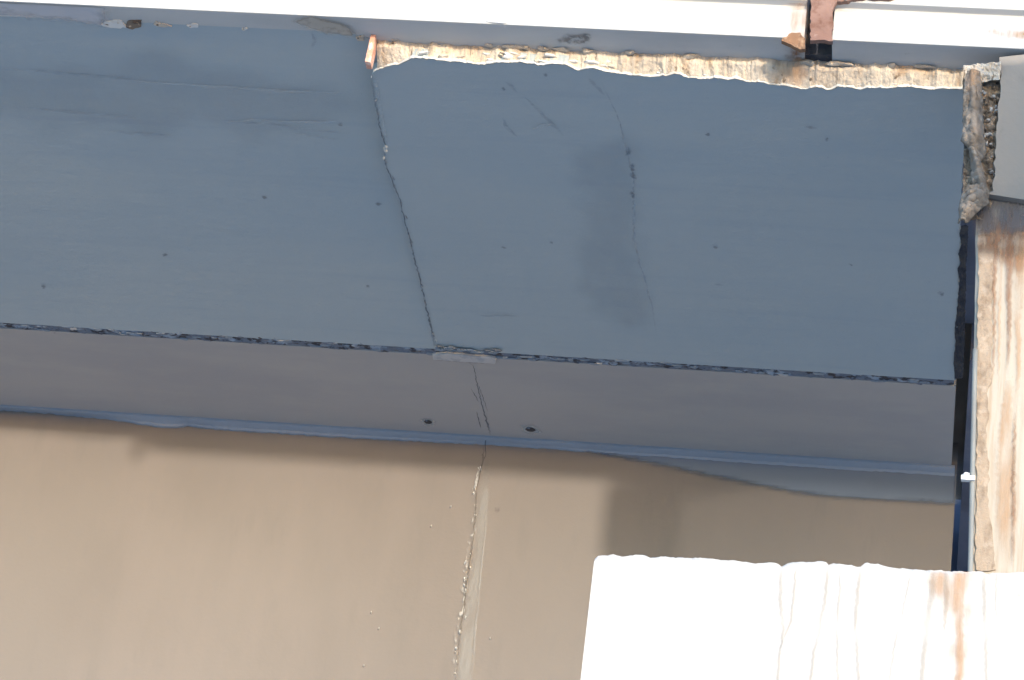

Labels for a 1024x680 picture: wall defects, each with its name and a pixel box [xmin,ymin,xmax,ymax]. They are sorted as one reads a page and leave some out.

crack [0,98,954,675]
spalling [356,34,1002,379]